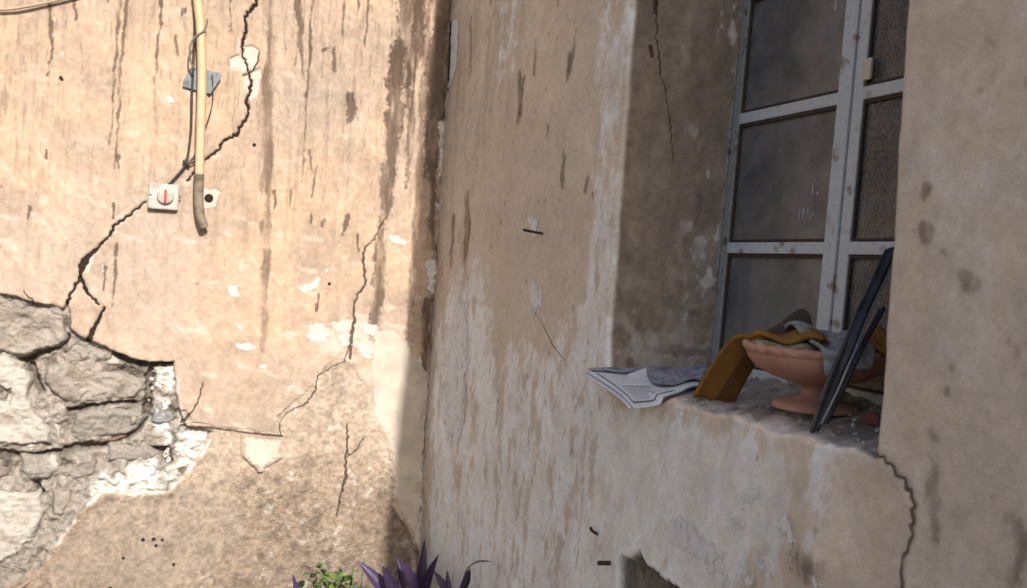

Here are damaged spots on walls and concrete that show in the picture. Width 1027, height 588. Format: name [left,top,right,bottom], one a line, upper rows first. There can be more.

leakage [115,0,128,68]
crack [186,0,262,182]
leakage [382,0,452,237]
crack [66,202,146,342]
leakage [103,243,118,290]
peeling [227,285,240,297]
crack [180,220,384,437]
peeling [298,268,332,294]
leakage [369,248,384,325]
peeling [442,290,470,451]
flaking render [0,294,429,588]
crack [336,424,364,516]